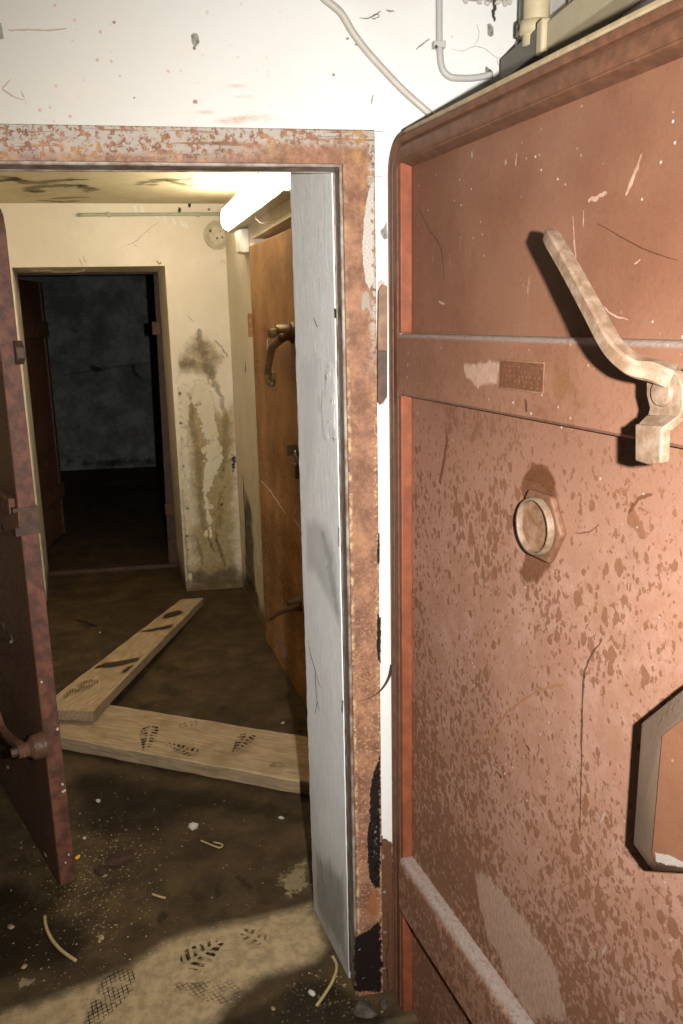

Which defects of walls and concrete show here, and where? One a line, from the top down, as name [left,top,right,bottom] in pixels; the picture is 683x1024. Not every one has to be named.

damp [181,342,219,376]
damp [188,398,258,606]